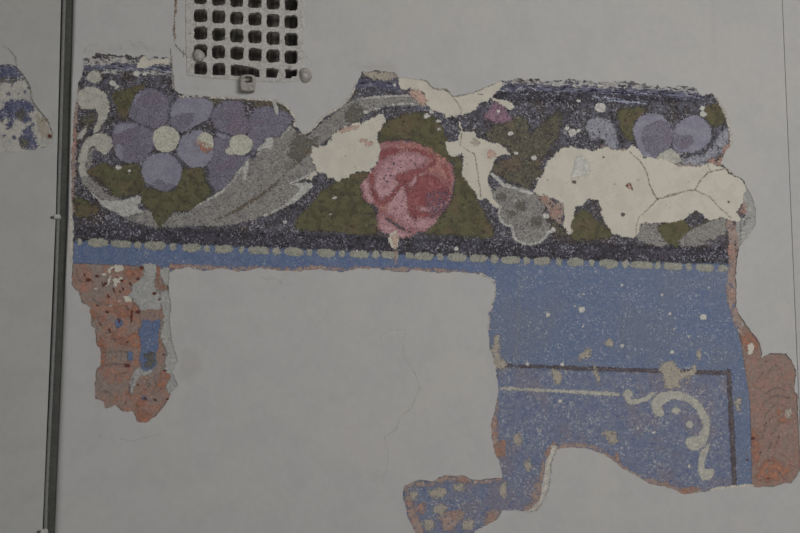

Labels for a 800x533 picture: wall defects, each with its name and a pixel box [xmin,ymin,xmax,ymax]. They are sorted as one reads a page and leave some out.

crack [630,152,745,226]